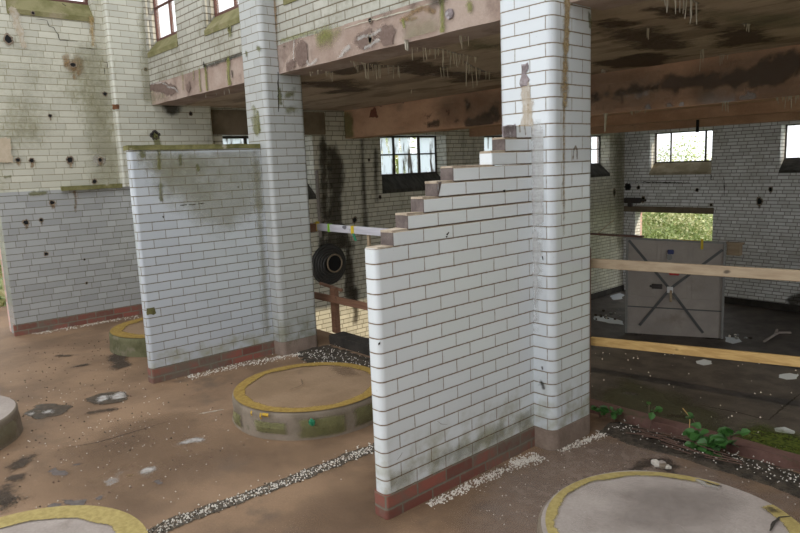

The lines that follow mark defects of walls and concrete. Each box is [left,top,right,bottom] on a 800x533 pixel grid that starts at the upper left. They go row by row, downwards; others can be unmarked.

peeling [354,17,395,50]
peeling [149,82,190,96]
peeling [286,40,307,71]
spalling [519,62,530,87]
corrosion [561,0,570,127]